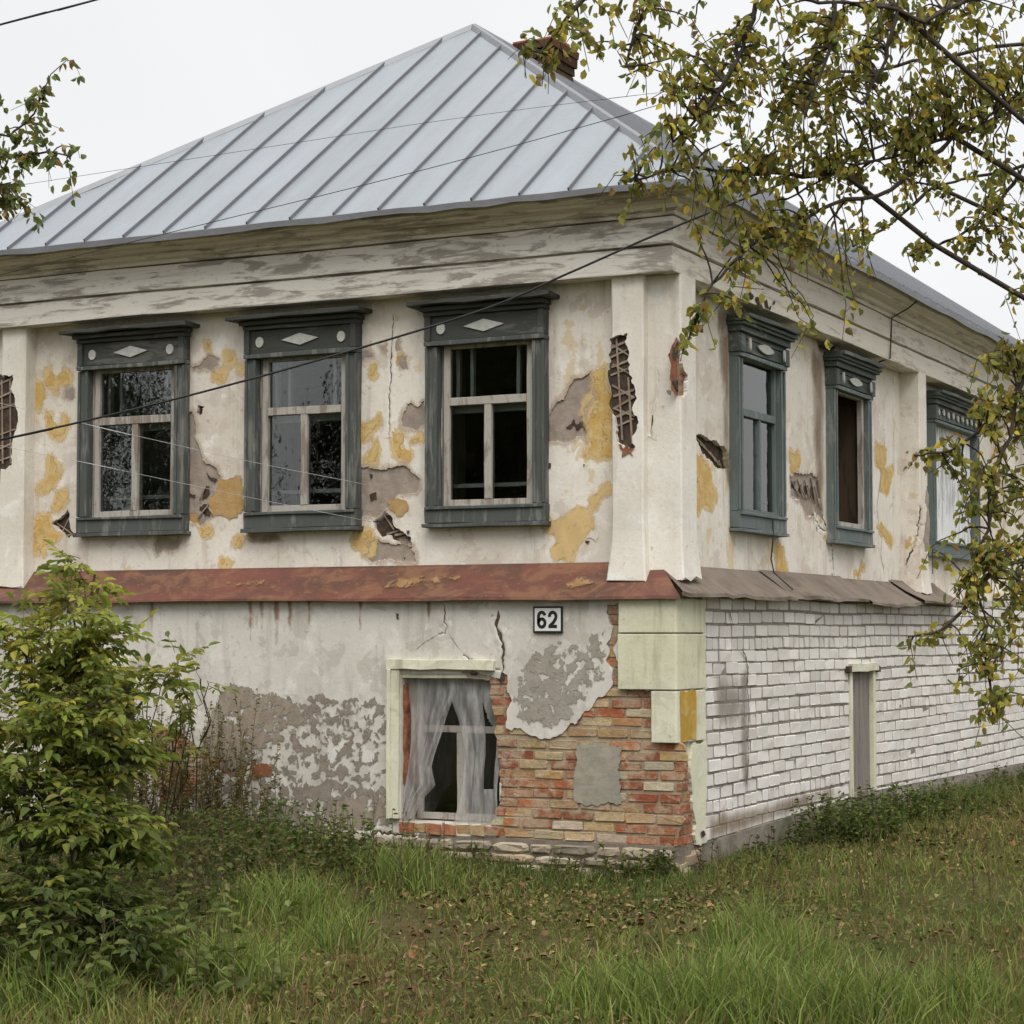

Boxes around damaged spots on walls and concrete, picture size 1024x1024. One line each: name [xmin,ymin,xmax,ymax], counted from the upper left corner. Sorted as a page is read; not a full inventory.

crack [383,314,400,438]
spalling [549,363,634,466]
peeling [33,453,77,558]
spalling [189,406,244,540]
spalling [350,400,425,564]
spalling [696,435,724,517]
spalling [789,447,827,540]
corrosion [385,575,460,588]
corrosion [556,577,593,588]
crack [414,601,512,679]
peeling [151,683,420,843]
flaking render [462,604,706,856]